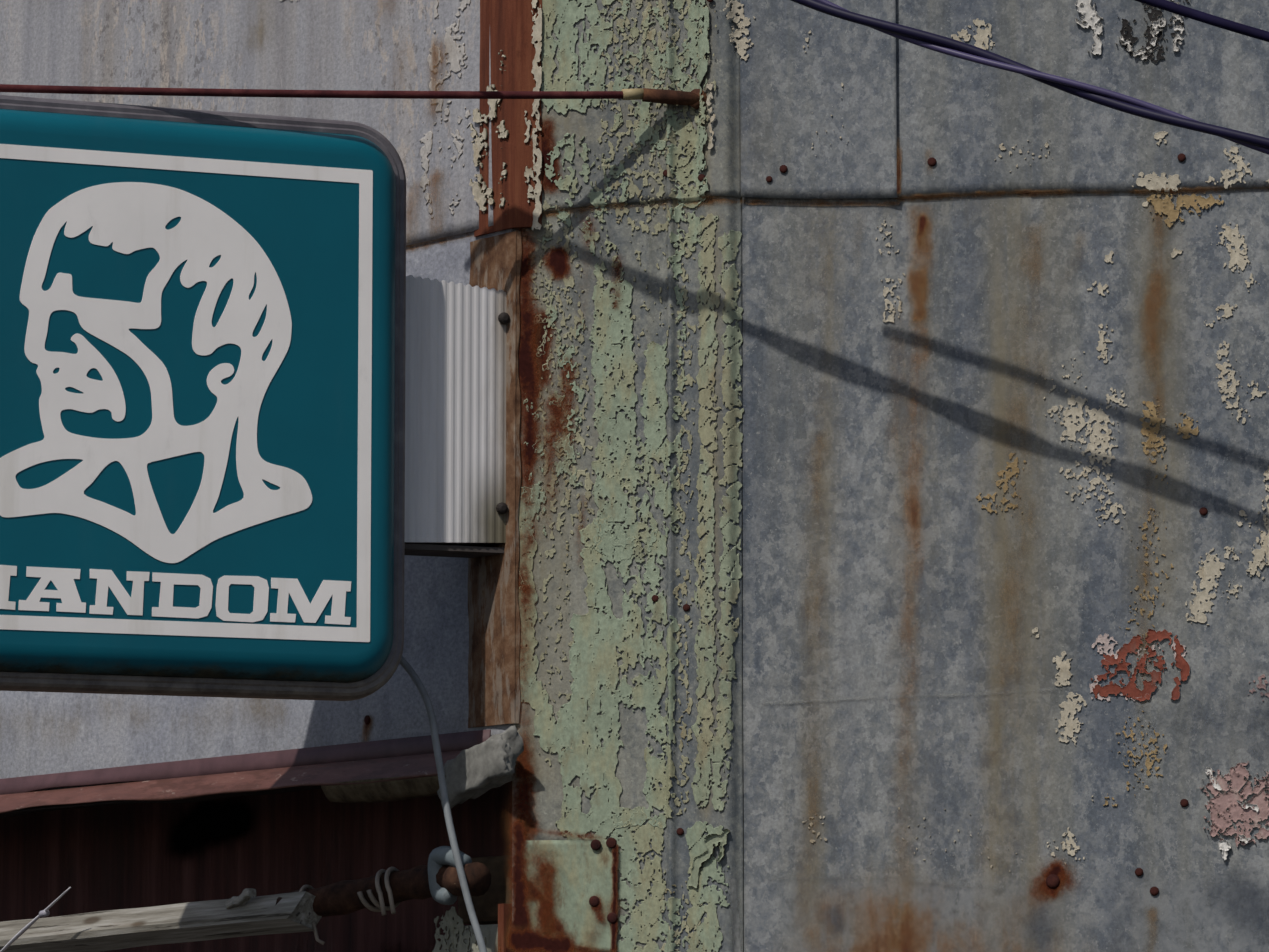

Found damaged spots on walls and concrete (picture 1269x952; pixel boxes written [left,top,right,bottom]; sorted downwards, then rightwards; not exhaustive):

peeling [419,0,508,218]
rust [541,119,560,193]
rust [884,150,959,319]
peeling [1075,0,1190,67]
peeling [1132,146,1269,228]
rust [518,228,574,506]
peeling [518,0,755,952]
peeling [1036,324,1269,807]
rust [498,721,618,952]
rust [854,902,929,952]
rust [1031,863,1072,901]
peeling [1200,761,1269,861]